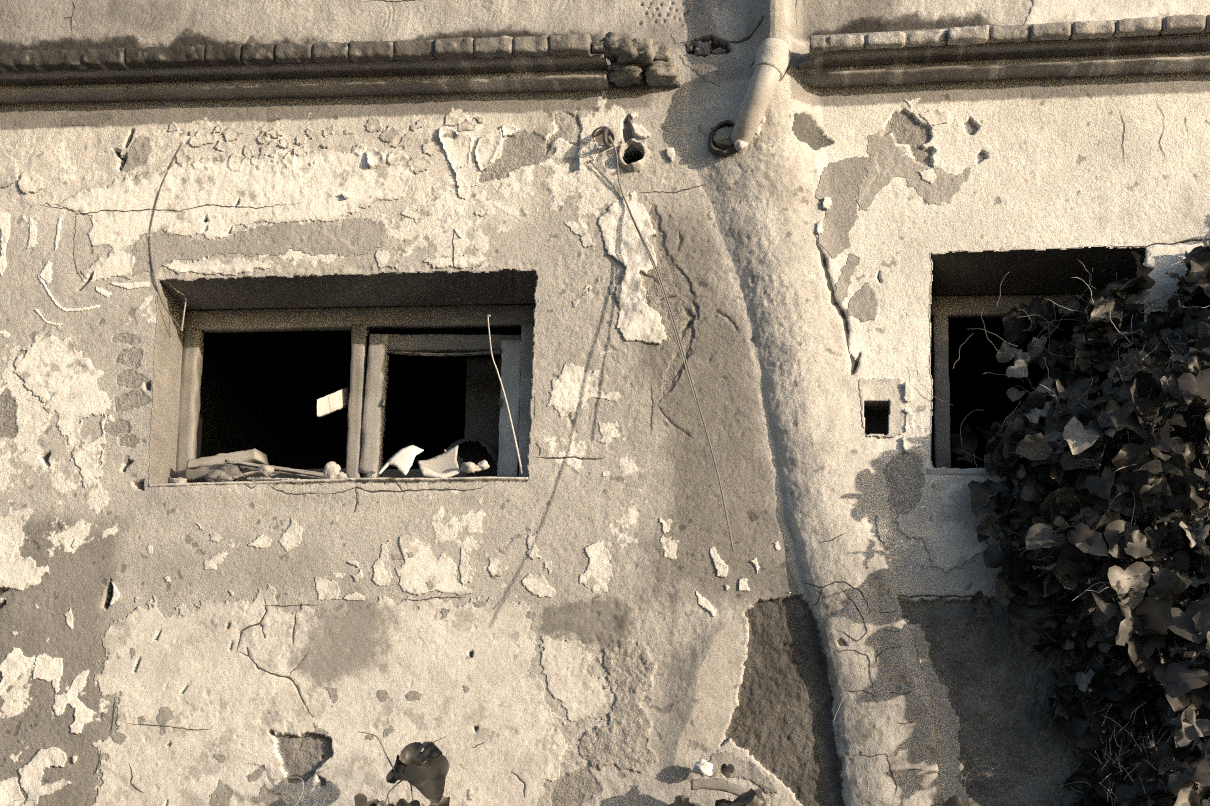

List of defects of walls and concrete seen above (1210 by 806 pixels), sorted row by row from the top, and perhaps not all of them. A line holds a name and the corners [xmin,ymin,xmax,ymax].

peeling [1024,0,1210,25]
crack [729,15,763,67]
flaking render [792,112,833,150]
peeling [0,112,675,291]
peeling [816,98,987,322]
peeling [565,191,699,395]
peeling [0,333,151,488]
peeling [547,362,620,417]
peeling [597,421,619,444]
peeling [248,518,303,552]
peeling [659,518,679,560]
peeling [0,523,657,806]